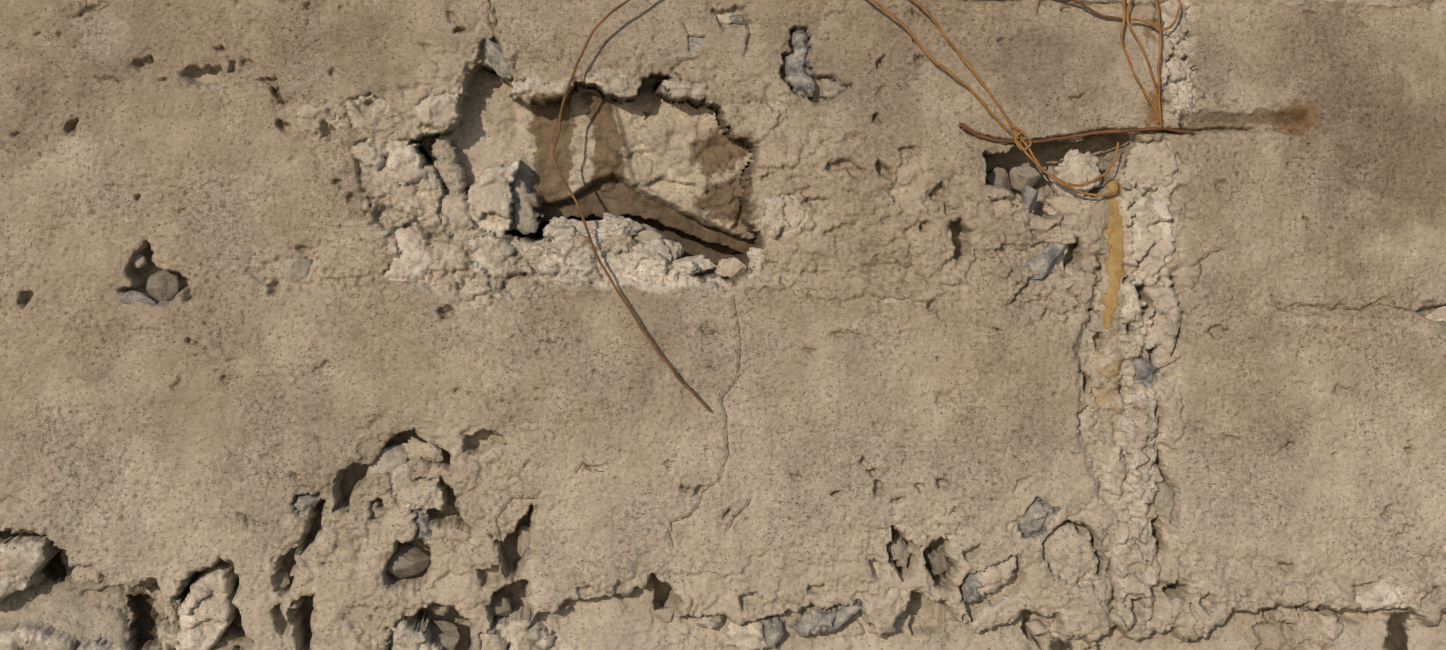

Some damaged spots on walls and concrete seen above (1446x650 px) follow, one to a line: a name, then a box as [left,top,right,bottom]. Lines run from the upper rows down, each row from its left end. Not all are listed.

spalling [771,17,860,120]
spalling [298,0,810,299]
corrosion [1101,178,1124,329]
spalling [976,0,1316,527]
crack [1271,293,1410,311]
crack [669,297,741,548]
spalling [0,524,249,650]
peeling [387,603,460,650]
spalling [643,488,1204,650]
damp [1050,637,1072,650]
spalling [1251,549,1406,650]
damp [1383,611,1410,650]